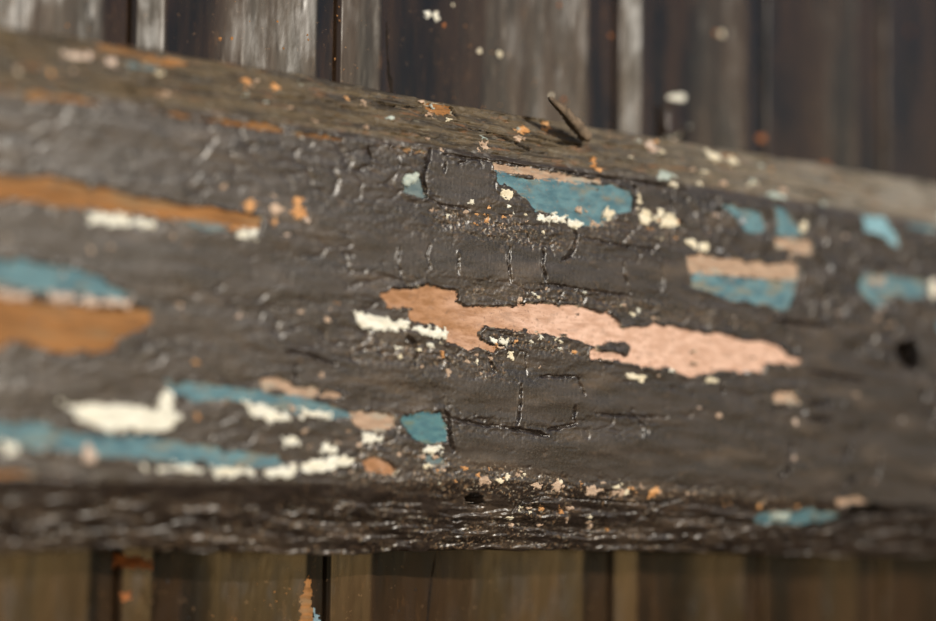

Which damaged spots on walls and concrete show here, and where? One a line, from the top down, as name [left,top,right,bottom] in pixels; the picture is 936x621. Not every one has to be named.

peeling [422,103,450,118]
peeling [704,148,738,166]
peeling [0,174,307,242]
peeling [493,163,679,230]
crack [542,214,650,295]
peeling [684,189,812,311]
peeling [0,258,152,354]
peeling [353,284,801,384]
peeling [0,377,447,479]
crack [446,376,584,448]
crack [777,505,932,545]